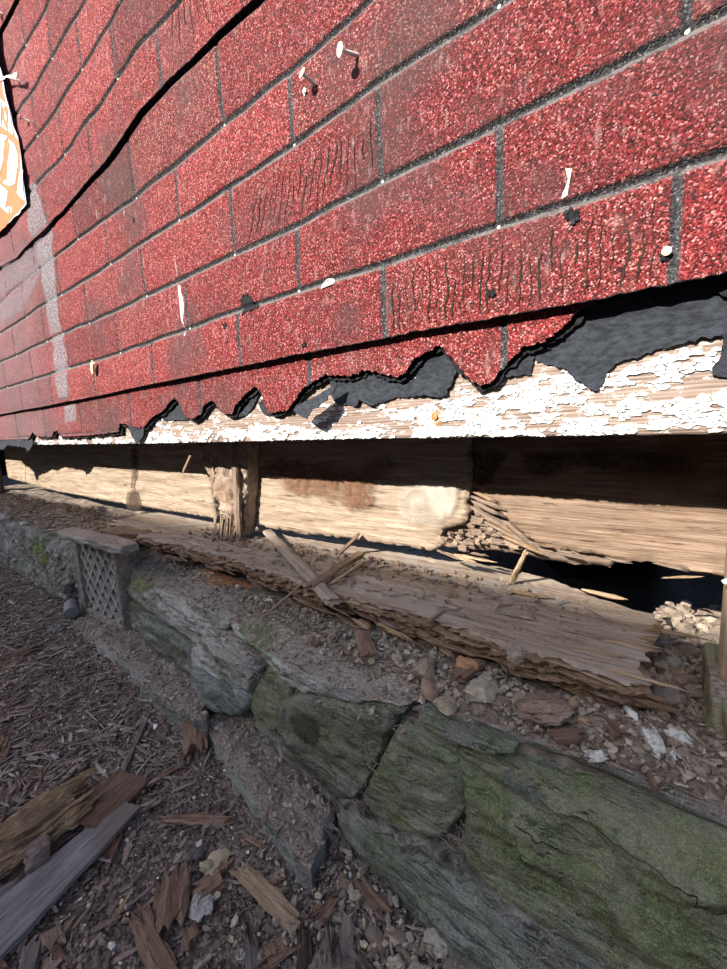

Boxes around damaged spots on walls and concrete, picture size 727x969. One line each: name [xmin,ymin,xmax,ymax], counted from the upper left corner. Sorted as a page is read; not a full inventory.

peeling [33,346,727,445]
peeling [444,512,521,552]